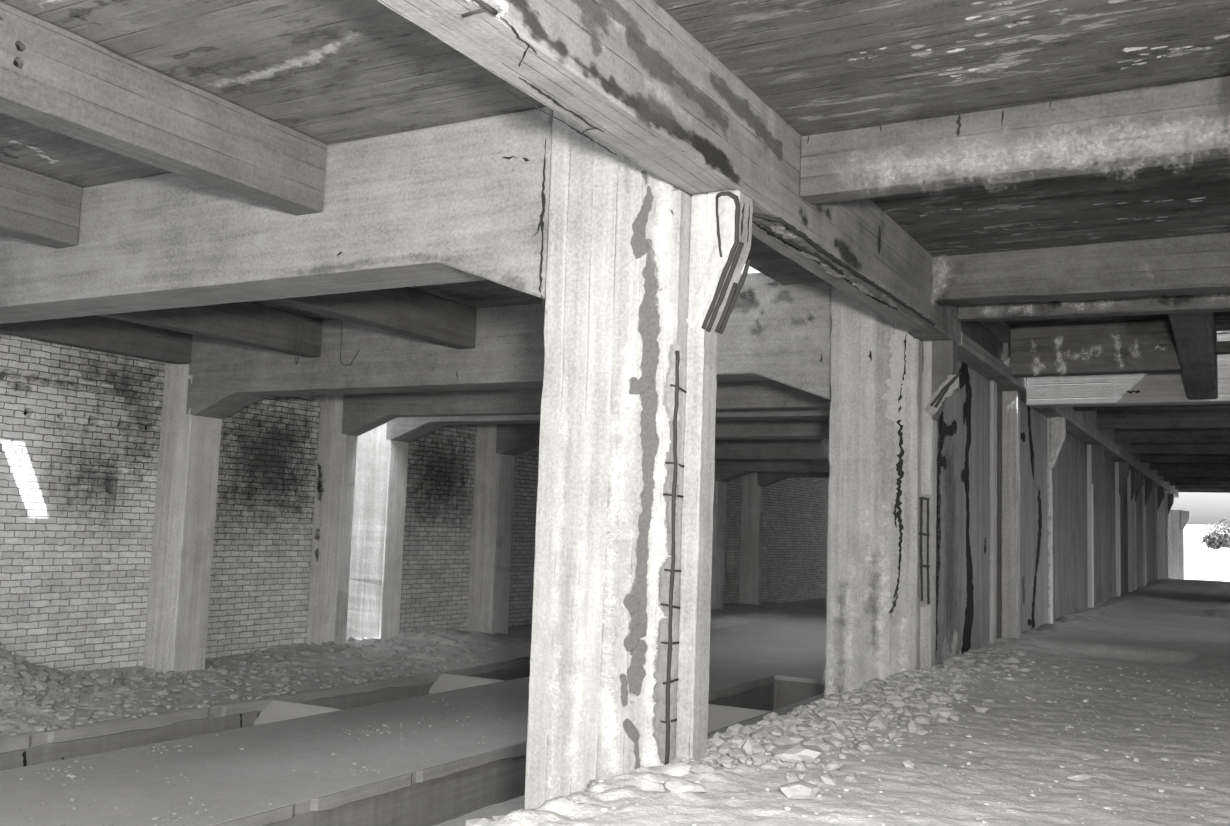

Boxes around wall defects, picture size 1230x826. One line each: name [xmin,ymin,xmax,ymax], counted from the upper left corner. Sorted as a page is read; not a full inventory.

spalling [461,0,509,19]
peeling [1124,46,1192,64]
spalling [686,191,938,429]
crack [741,203,907,614]
spalling [924,371,961,415]
spalling [652,344,687,764]